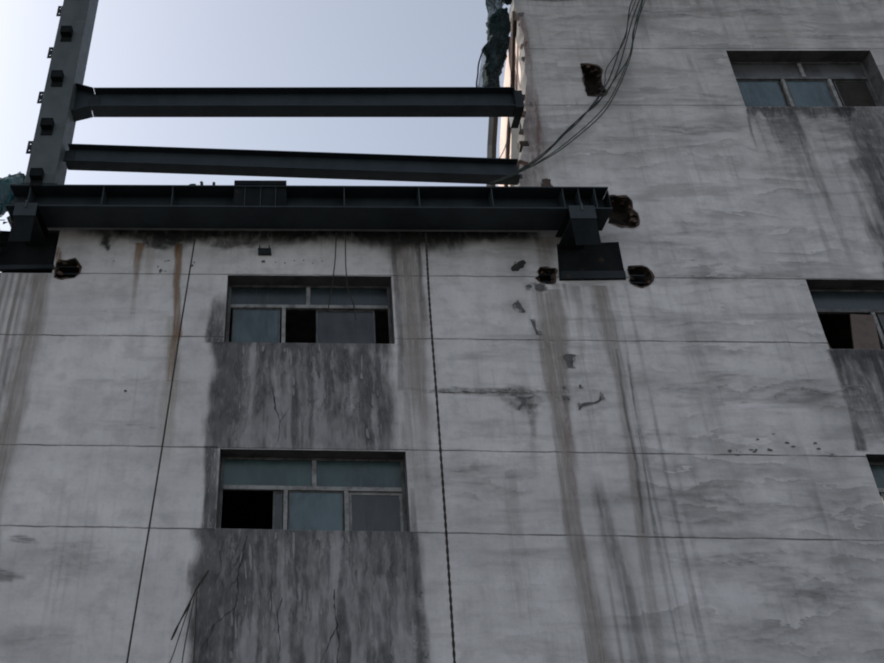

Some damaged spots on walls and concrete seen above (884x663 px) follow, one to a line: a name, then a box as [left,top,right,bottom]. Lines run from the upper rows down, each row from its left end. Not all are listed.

spalling [580,63,608,96]
leakage [747,106,884,220]
spalling [608,194,640,228]
spalling [54,258,82,280]
corrosion [173,243,182,347]
leakage [89,229,537,386]
spalling [526,266,558,291]
spalling [627,265,655,288]
leakage [0,274,47,480]
spalling [562,384,605,410]
leakage [830,349,884,397]
leakage [191,306,427,663]